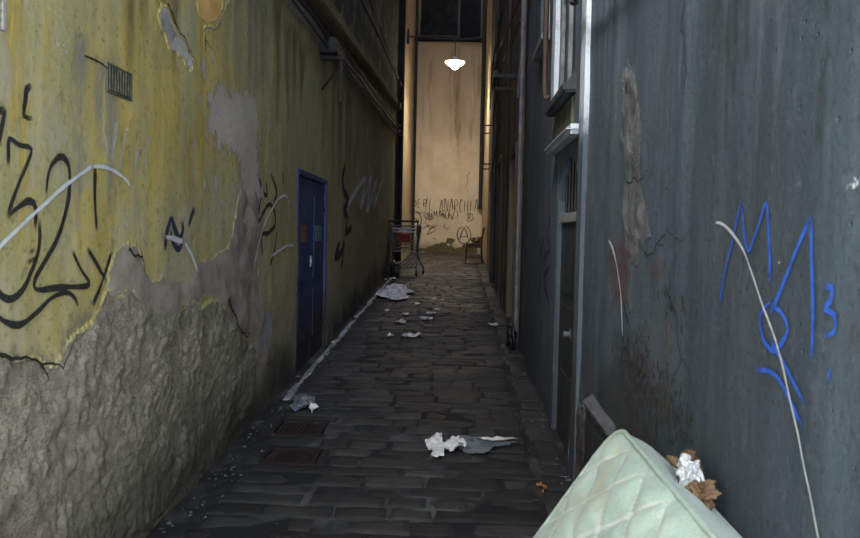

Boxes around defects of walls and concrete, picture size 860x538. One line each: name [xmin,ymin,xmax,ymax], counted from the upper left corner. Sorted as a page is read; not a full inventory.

spalling [0,0,274,538]
spalling [619,59,651,267]